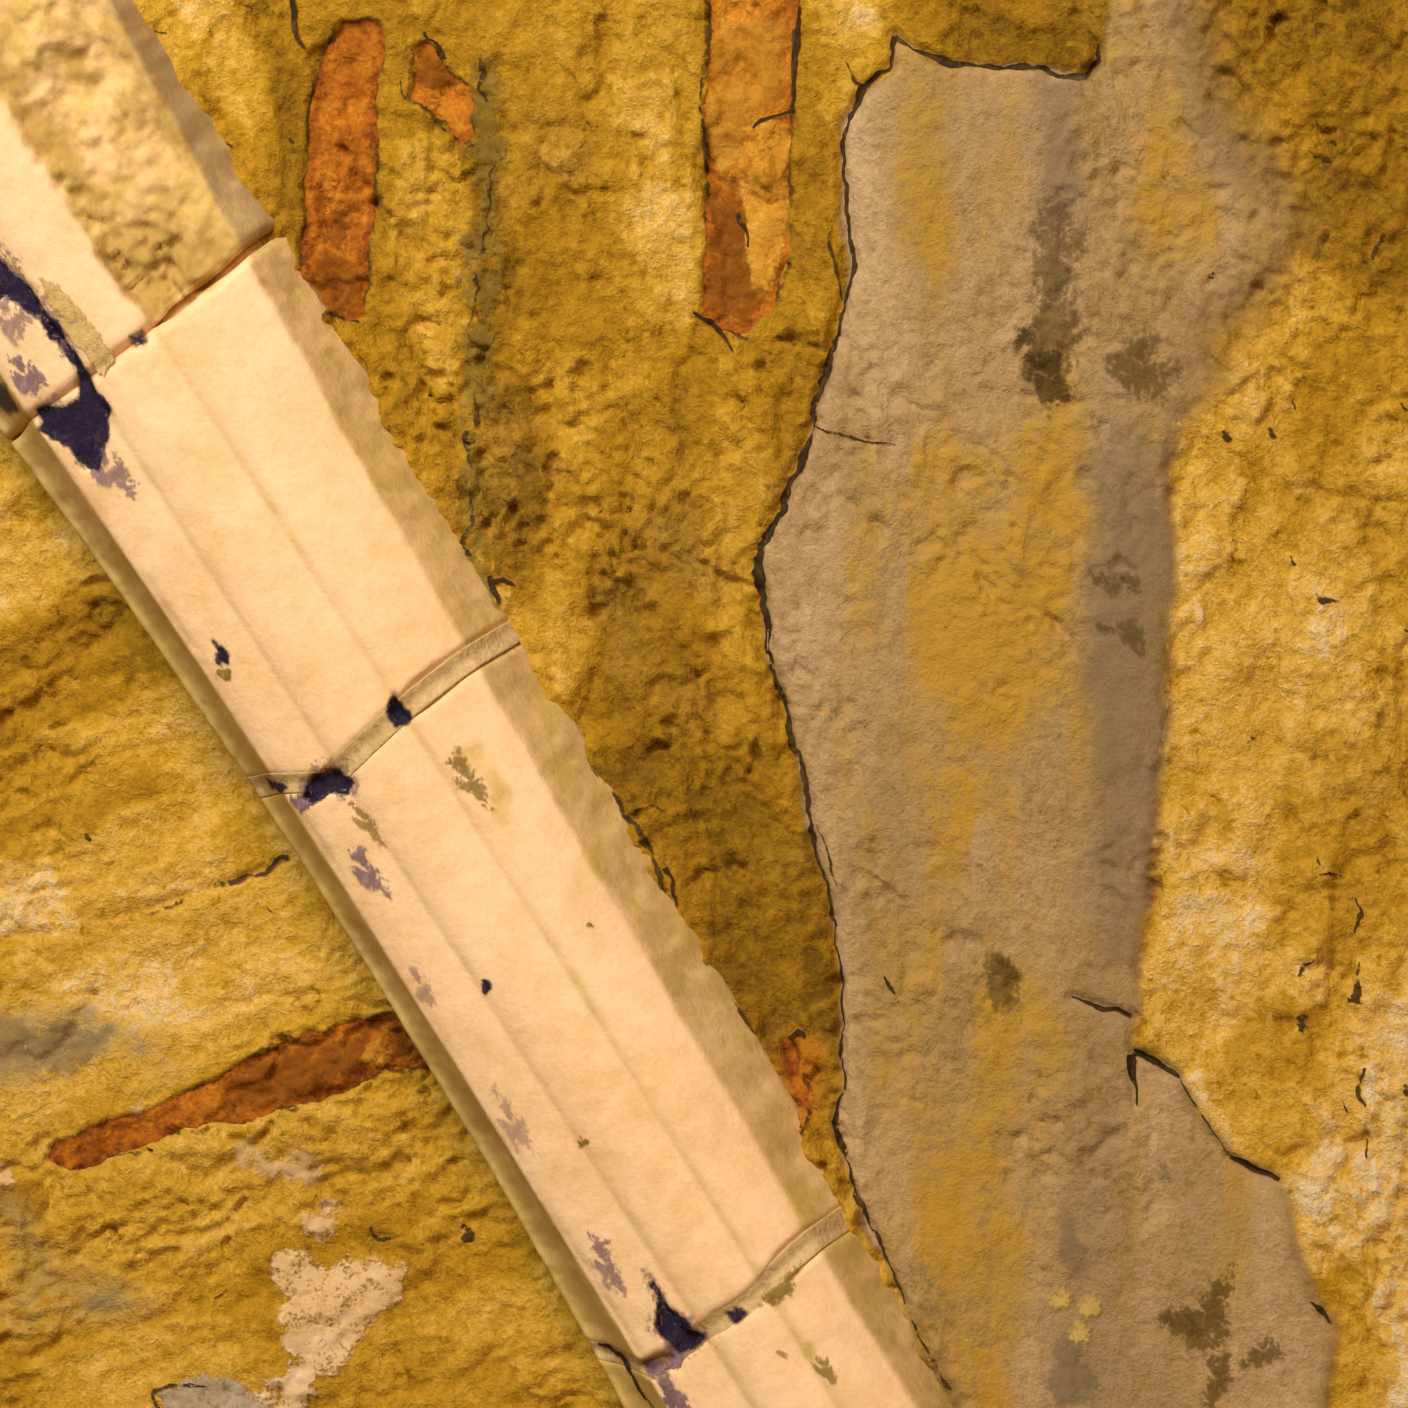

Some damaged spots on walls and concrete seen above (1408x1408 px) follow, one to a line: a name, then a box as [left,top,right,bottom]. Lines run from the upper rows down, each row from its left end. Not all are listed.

water stain [1013,326,1071,406]
water stain [1106,335,1180,403]
flaking render [762,0,1336,1408]
spalling [1347,964,1362,1003]
flaking render [48,1012,430,1185]
spalling [1341,1068,1366,1112]
peeling [0,1163,15,1186]
spalling [461,1223,474,1242]
peeling [151,1197,408,1408]
spalling [642,1281,707,1408]
spalling [725,1260,801,1323]
water stain [1158,1262,1281,1407]